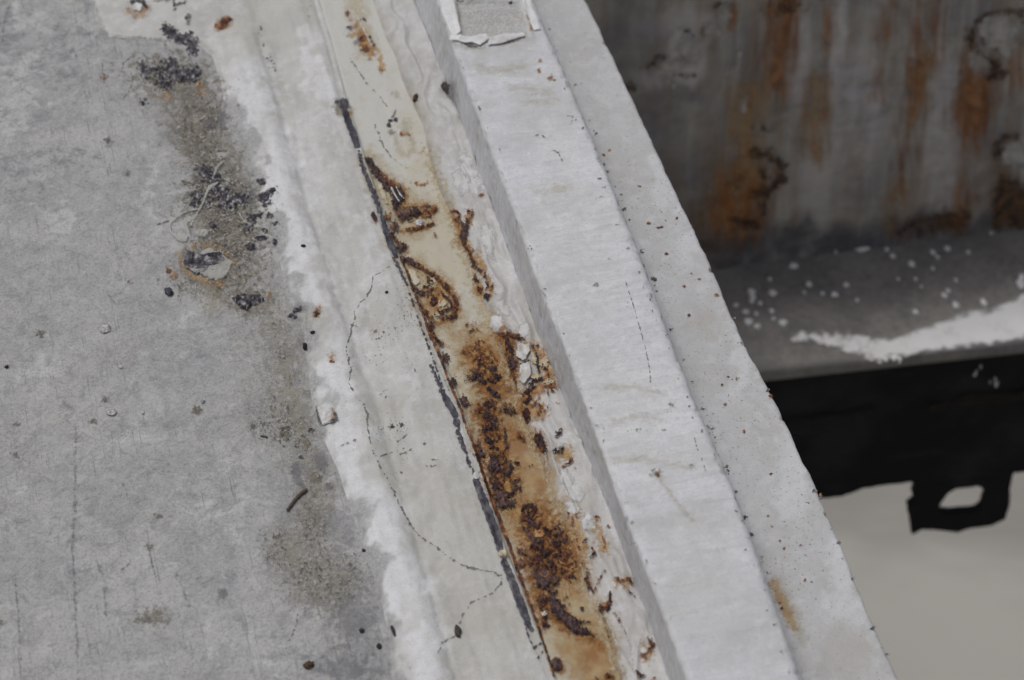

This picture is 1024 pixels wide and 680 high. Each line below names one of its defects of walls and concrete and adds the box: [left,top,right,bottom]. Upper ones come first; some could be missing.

corrosion [344,0,385,71]
leakage [134,606,163,624]
leakage [245,301,372,621]
crack [341,266,502,653]
corrosion [364,151,621,680]
leakage [791,273,1024,363]